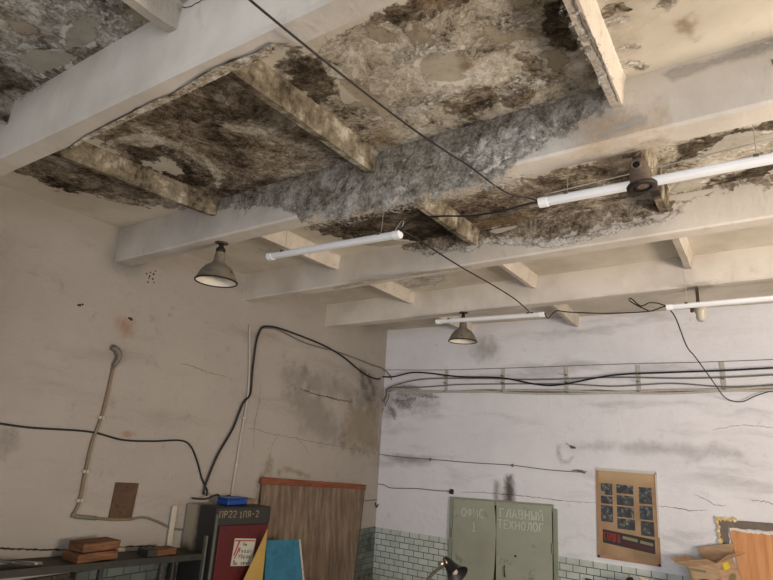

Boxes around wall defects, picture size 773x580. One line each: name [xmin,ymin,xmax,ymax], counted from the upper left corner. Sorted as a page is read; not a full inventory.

peeling [0,1,149,79]
peeling [405,21,473,87]
peeling [668,40,773,77]
spalling [70,43,304,148]
peeling [697,131,773,161]
peeling [669,178,707,193]
crack [253,387,377,454]